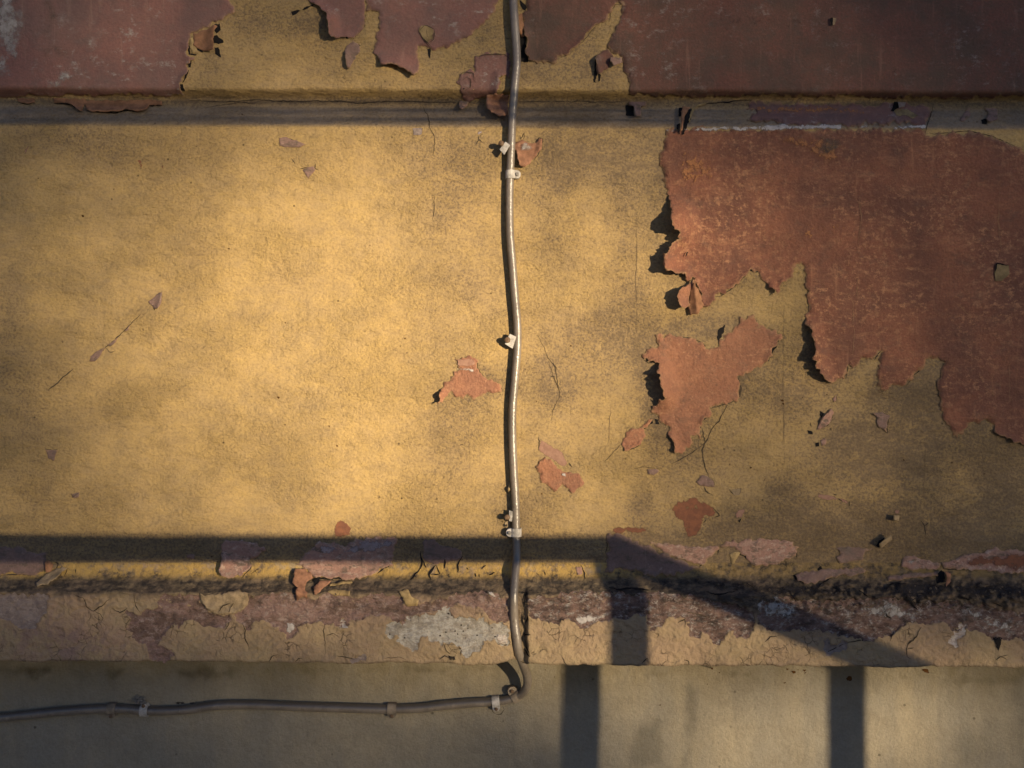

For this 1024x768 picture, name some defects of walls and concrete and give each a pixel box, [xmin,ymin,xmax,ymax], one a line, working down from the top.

peeling [291,0,498,76]
peeling [456,0,1024,461]
peeling [437,355,502,404]
peeling [0,546,76,629]
crack [75,595,140,622]
crack [224,622,352,662]
peeling [125,536,510,663]
crack [522,592,530,657]
peeling [604,533,868,585]
peeling [525,566,1024,656]
crack [828,582,921,659]
peeling [887,546,1024,586]